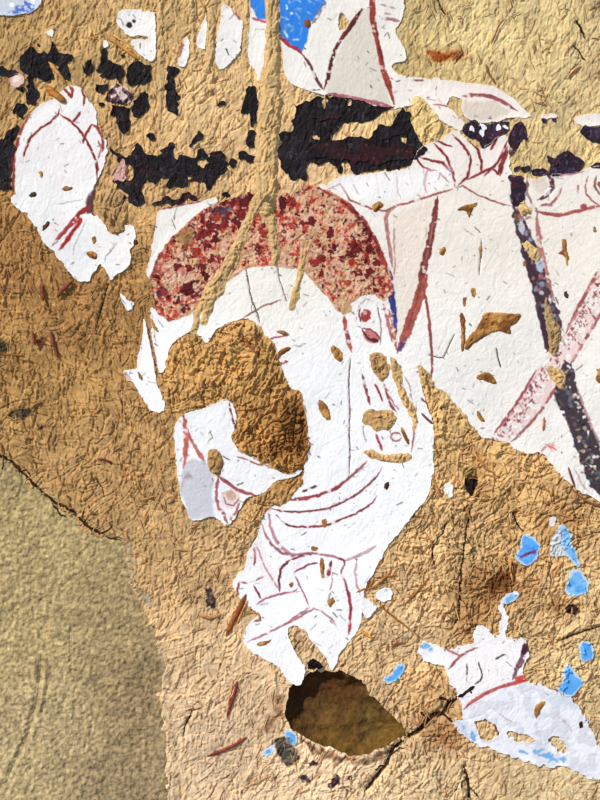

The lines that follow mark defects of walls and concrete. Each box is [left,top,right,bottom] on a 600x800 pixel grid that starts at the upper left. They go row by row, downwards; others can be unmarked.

spalling [163,318,311,552]
spalling [362,352,417,463]
spalling [417,365,485,446]
flaking render [476,372,497,384]
spalling [547,366,566,389]
crack [0,454,121,541]
peeling [515,534,540,566]
peeling [383,663,405,684]
peeling [284,729,297,746]
crack [364,686,475,792]